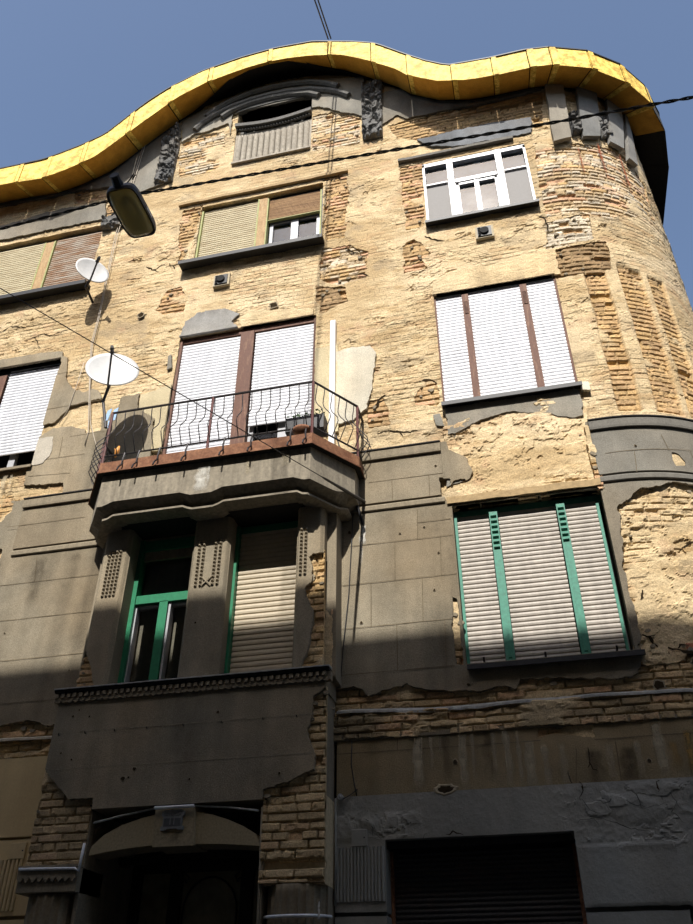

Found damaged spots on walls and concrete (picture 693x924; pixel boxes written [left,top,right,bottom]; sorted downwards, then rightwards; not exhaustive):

flaking render [156,287,188,315]
flaking render [315,175,368,313]
flaking render [532,143,654,282]
flaking render [442,397,604,510]
flaking render [258,483,693,885]
flaking render [0,721,93,866]